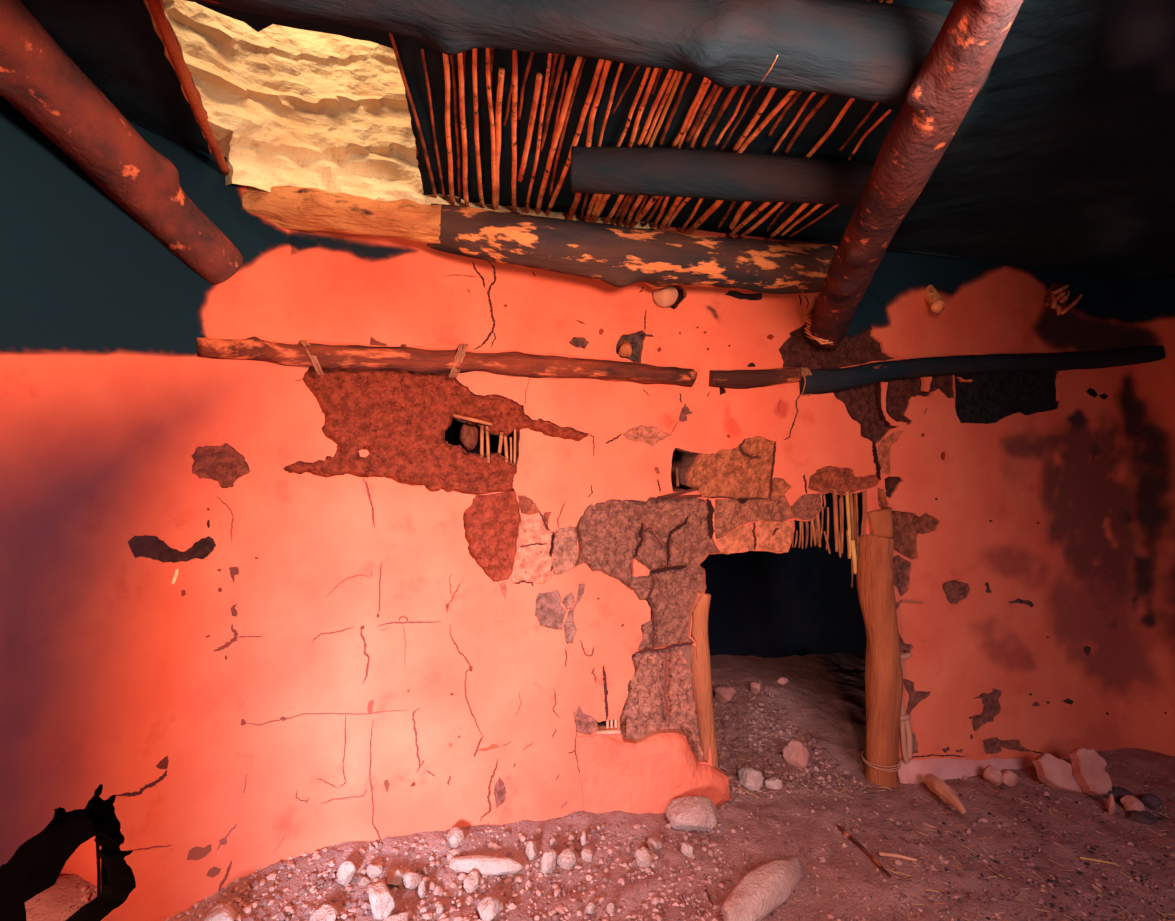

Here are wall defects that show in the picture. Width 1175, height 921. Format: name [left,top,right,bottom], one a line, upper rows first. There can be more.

crack [448,261,496,349]
spalling [779,318,920,370]
spalling [191,443,249,488]
crack [363,478,375,527]
spalling [283,367,588,643]
spalling [688,436,791,500]
spalling [808,371,1059,609]
spalling [128,535,215,563]
crack [214,624,262,651]
crack [312,563,609,825]
spalling [971,688,1031,754]
crack [248,707,451,840]